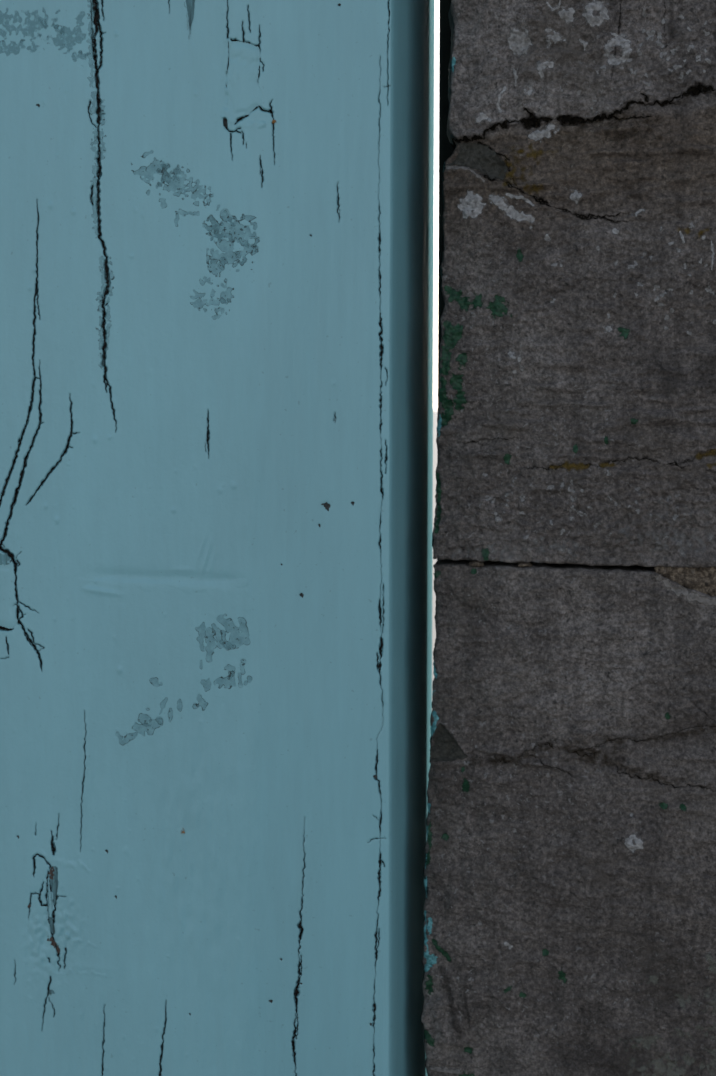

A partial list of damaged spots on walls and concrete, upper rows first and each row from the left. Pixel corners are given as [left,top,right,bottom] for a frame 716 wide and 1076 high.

crack [88,0,117,432]
peeling [184,0,195,34]
peeling [131,153,260,320]
crack [226,0,275,182]
crack [378,1,391,549]
crack [451,84,715,223]
crack [0,208,80,670]
peeling [120,614,249,745]
crack [28,710,86,1028]
crack [292,822,305,1076]
crack [368,583,386,1076]